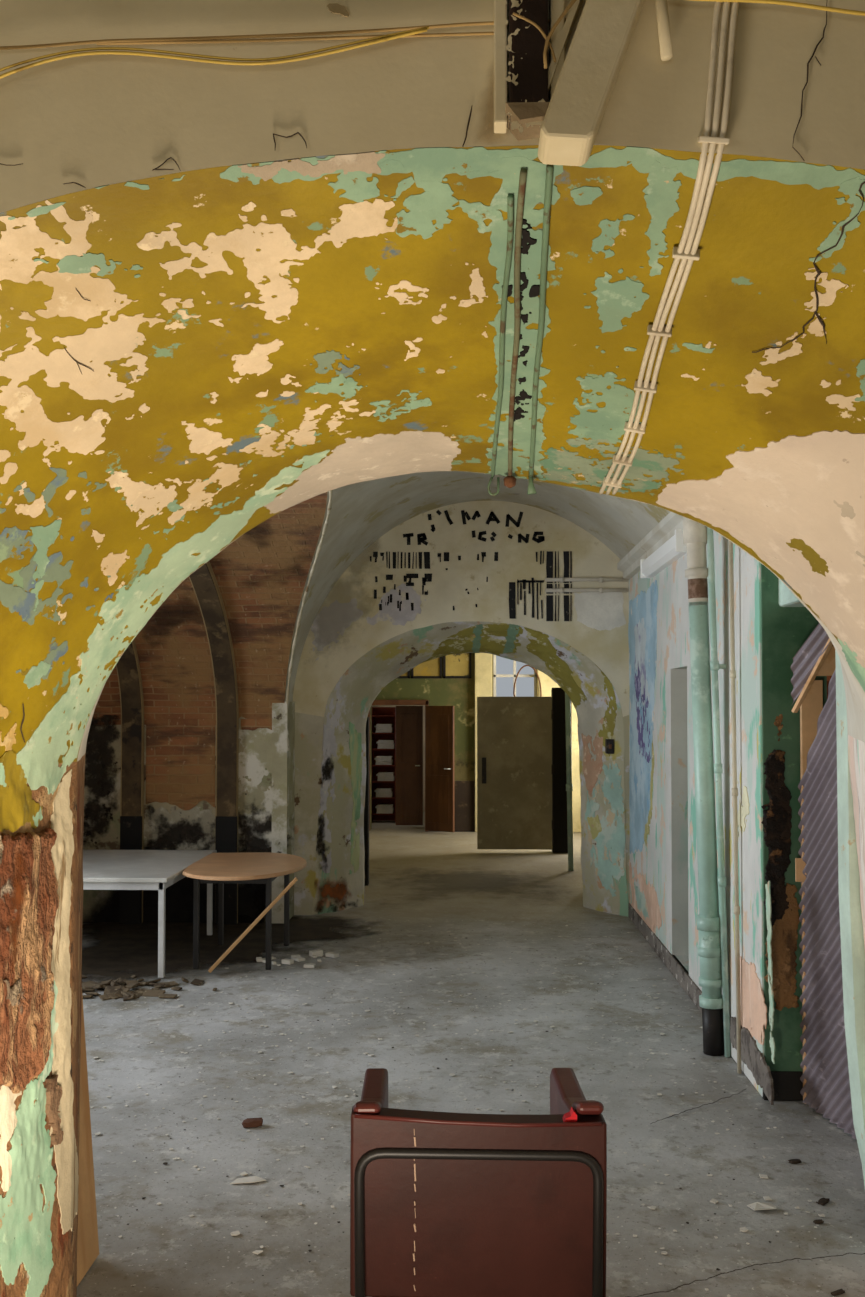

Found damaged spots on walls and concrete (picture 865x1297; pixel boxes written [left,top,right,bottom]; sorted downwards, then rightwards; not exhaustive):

crack [792,3,827,161]
peeling [570,186,603,206]
peeling [583,160,682,353]
peeling [741,177,865,396]
crack [752,182,865,353]
flaking render [533,359,865,692]
leakage [83,715,120,845]
leakage [143,805,215,850]
leakage [238,804,291,853]
peeling [0,112,543,1297]
peeling [422,624,662,932]
flaking render [730,714,801,1105]